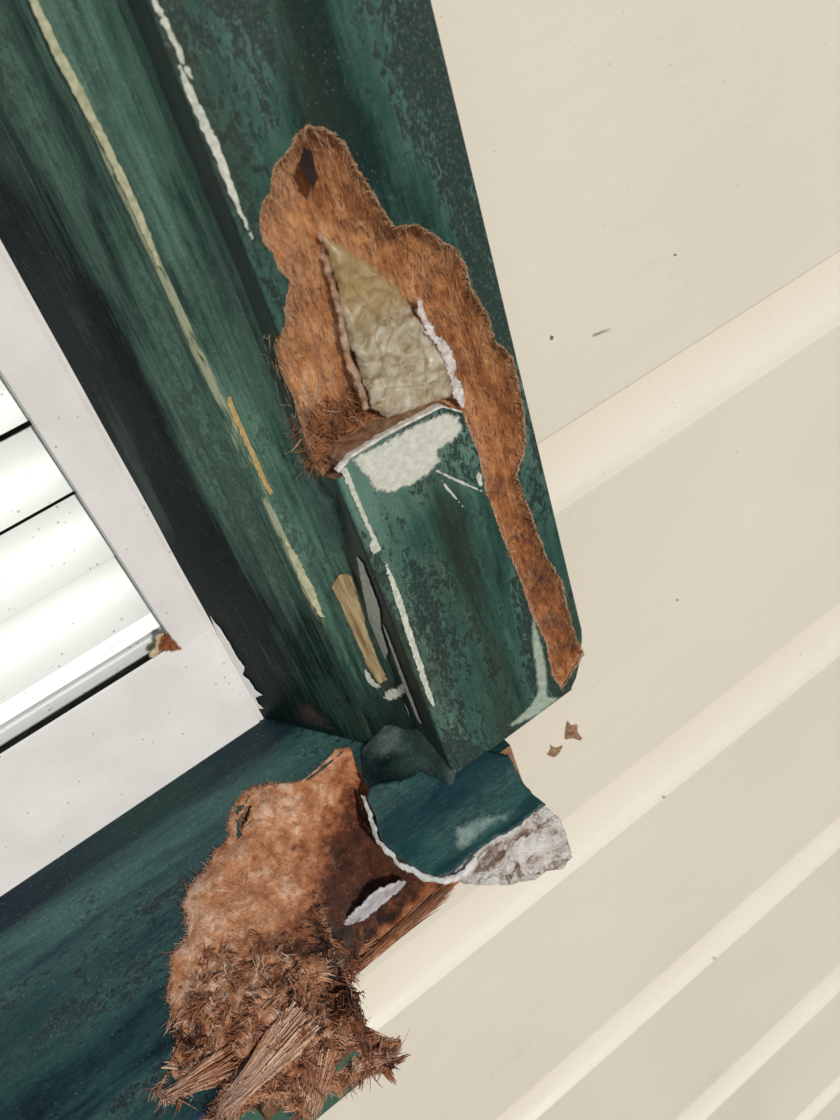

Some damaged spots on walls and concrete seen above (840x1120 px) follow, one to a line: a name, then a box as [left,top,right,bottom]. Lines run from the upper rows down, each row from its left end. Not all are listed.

peeling [318,233,370,410]
peeling [285,540,325,618]
peeling [332,297,466,723]
peeling [512,622,557,726]